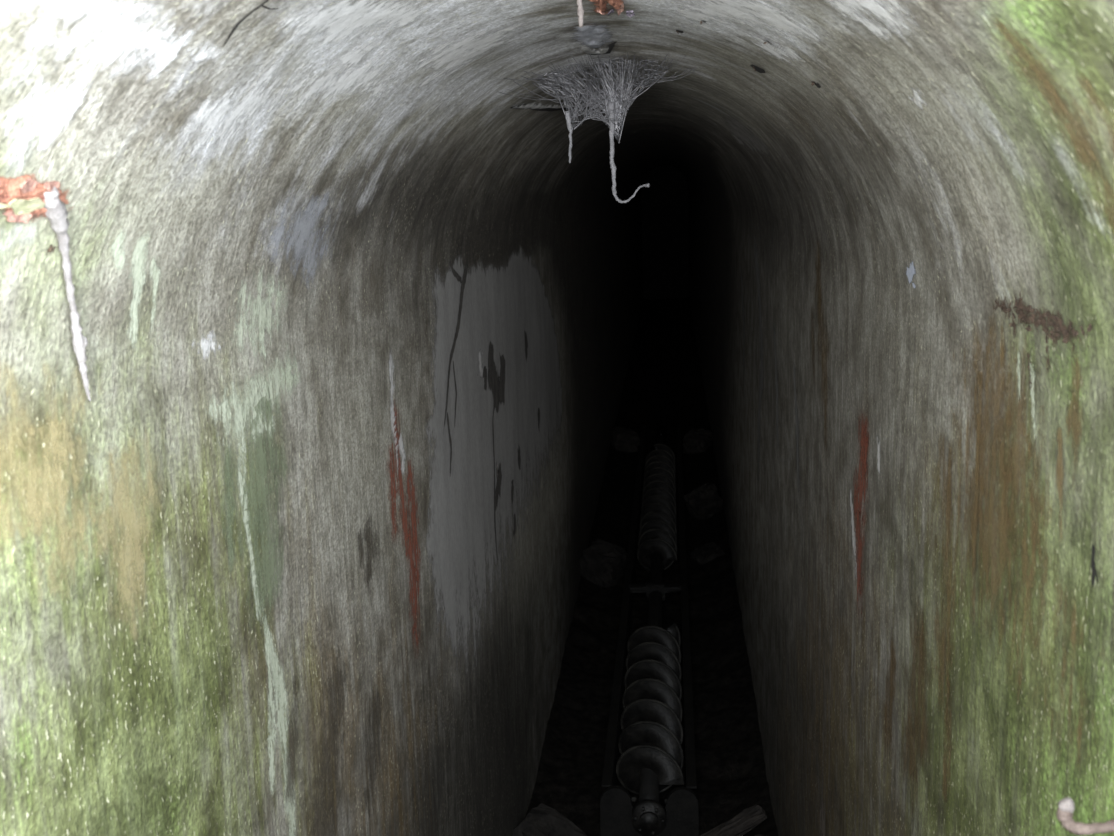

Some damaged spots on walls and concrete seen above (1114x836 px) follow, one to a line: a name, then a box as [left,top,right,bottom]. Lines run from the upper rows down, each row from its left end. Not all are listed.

rust [388,402,421,645]
rust [853,418,869,614]